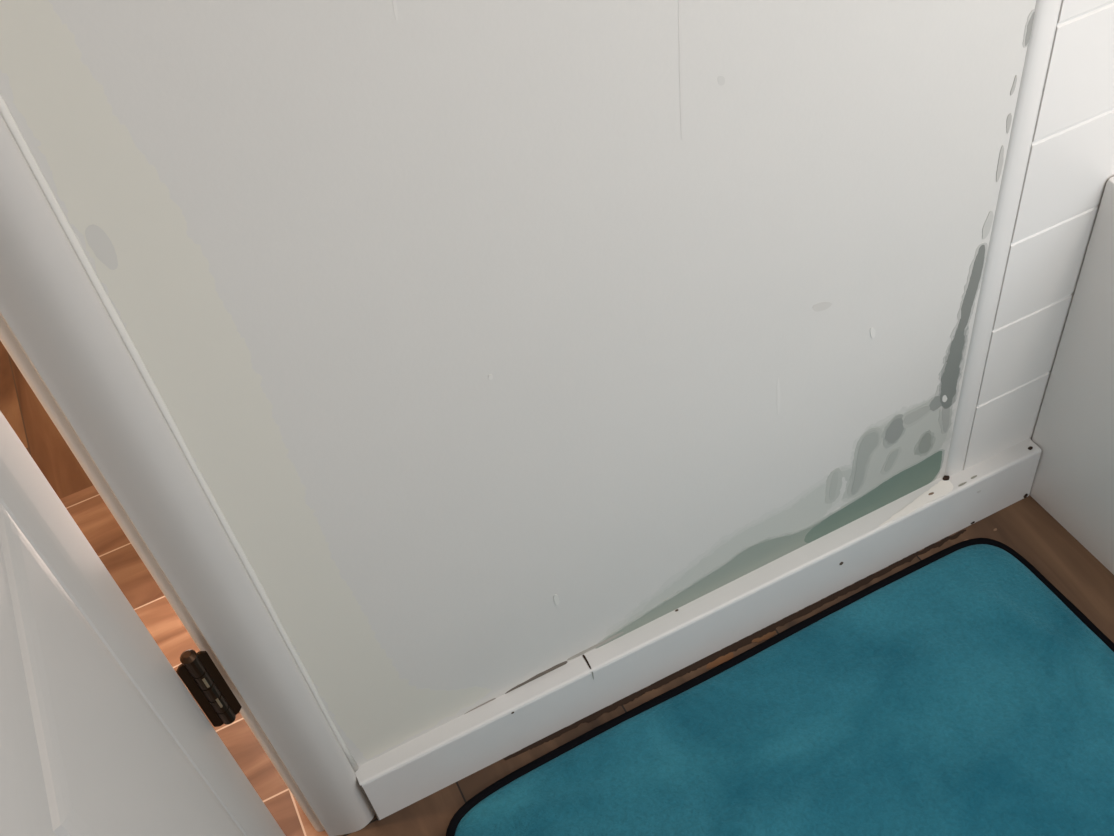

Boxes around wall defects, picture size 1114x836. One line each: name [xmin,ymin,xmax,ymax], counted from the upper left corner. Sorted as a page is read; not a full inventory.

leakage [605,319,970,637]